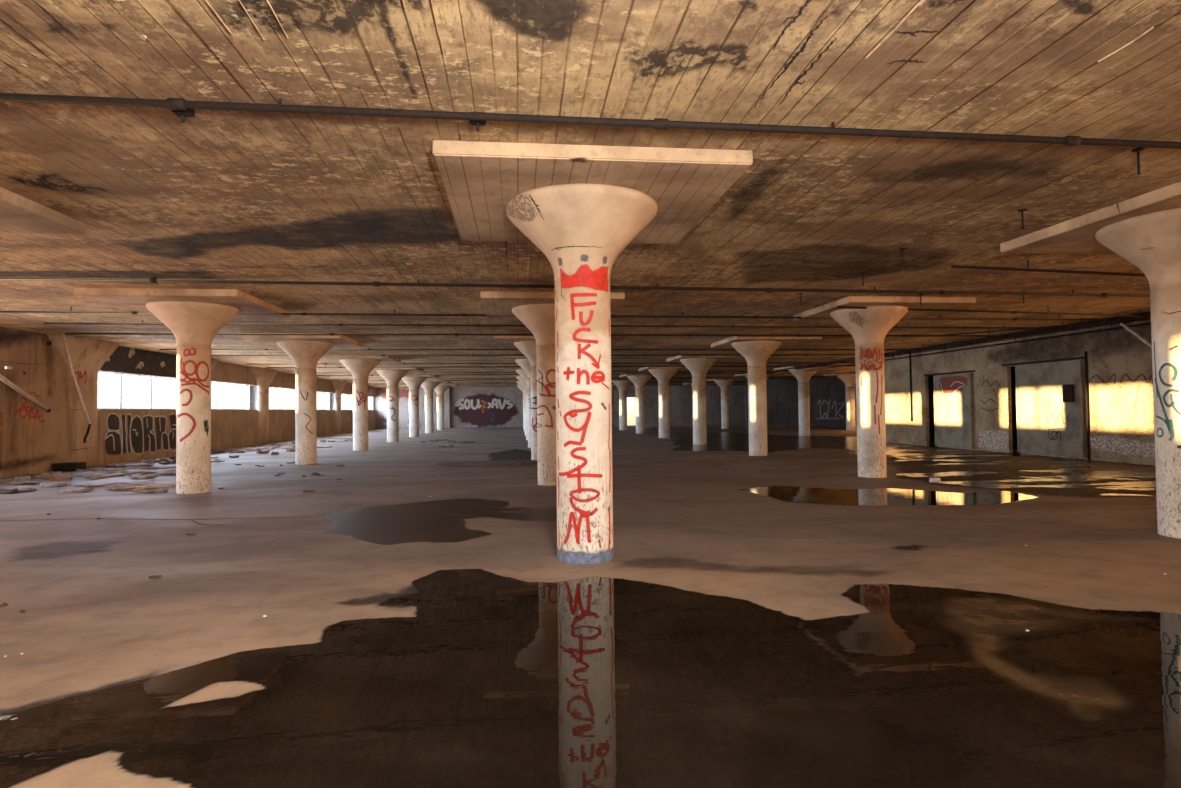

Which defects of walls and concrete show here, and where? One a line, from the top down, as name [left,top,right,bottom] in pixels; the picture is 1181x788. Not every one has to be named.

damp [478,0,584,40]
damp [1064,0,1096,15]
damp [218,0,424,95]
damp [629,41,748,77]
damp [10,174,104,194]